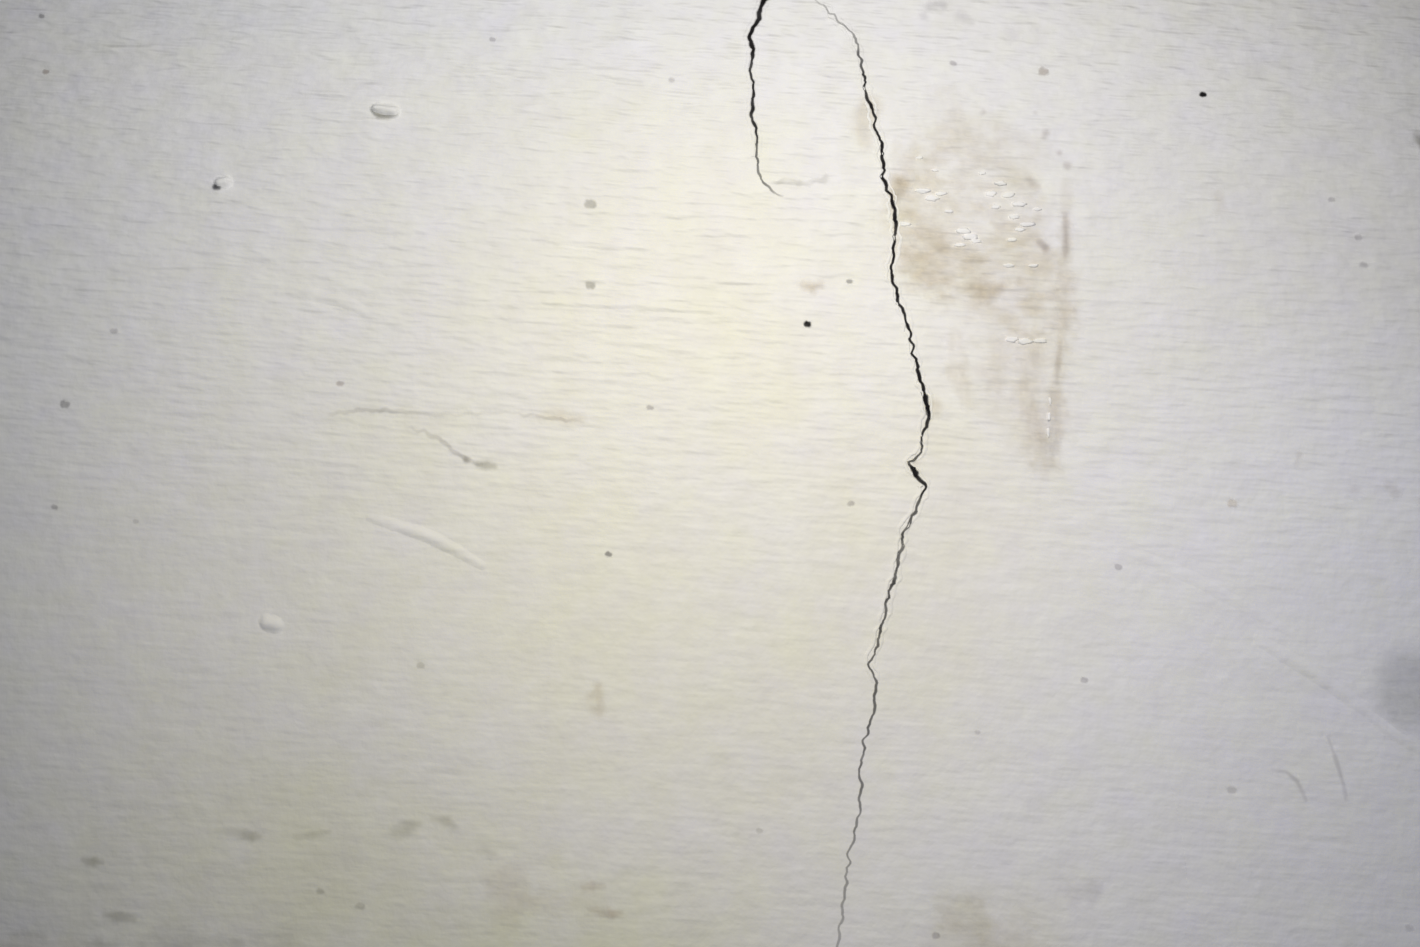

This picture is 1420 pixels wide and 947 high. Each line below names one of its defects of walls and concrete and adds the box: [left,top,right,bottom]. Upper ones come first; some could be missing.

crack [743,0,776,167]
crack [814,0,934,791]